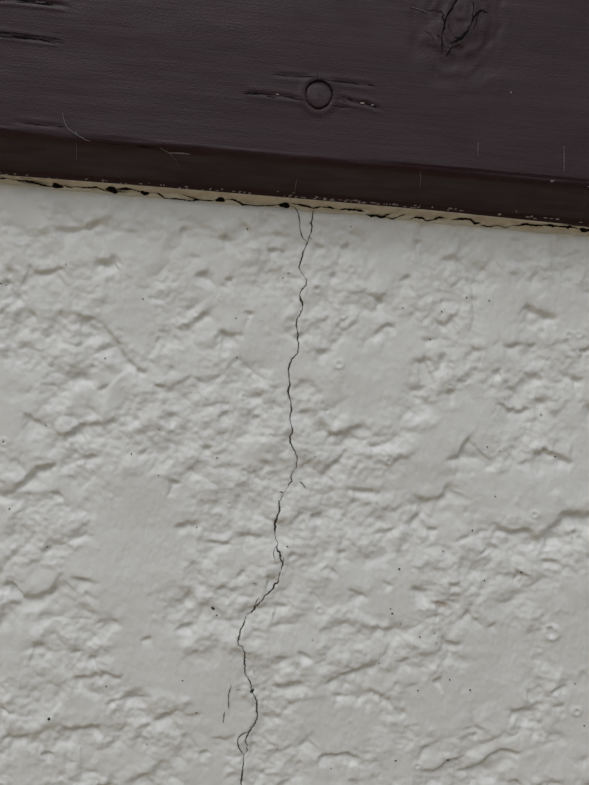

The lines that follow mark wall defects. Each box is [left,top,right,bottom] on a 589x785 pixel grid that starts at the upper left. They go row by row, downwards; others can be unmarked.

crack [0,177,578,785]